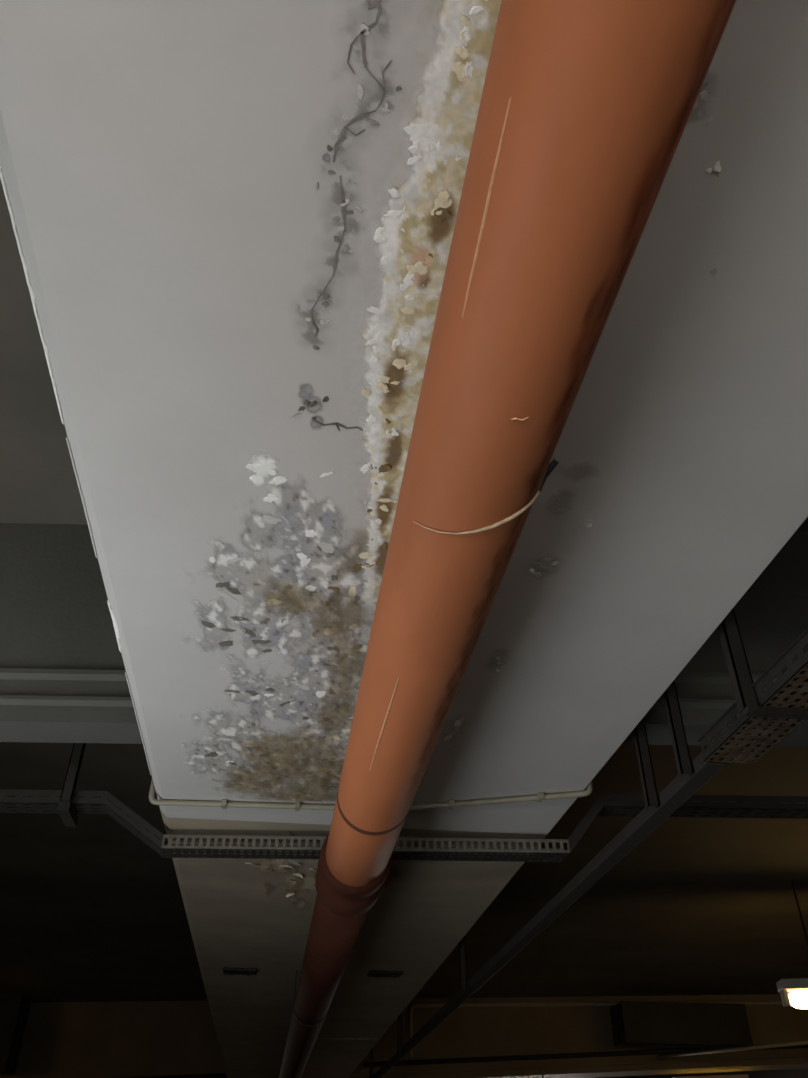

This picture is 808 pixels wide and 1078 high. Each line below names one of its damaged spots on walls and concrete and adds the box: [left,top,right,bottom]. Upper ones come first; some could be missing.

leakage [271,0,501,635]
peeling [182,456,379,803]
leakage [229,706,352,801]